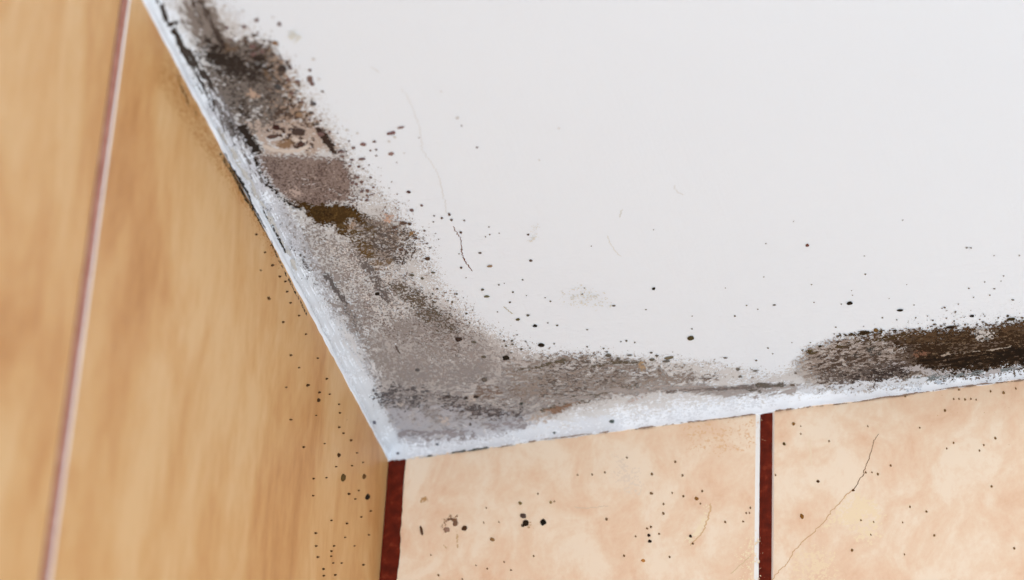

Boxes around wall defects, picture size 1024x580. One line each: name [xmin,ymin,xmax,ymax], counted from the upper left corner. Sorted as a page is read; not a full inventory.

damp [149,0,1024,461]
crack [772,433,879,580]